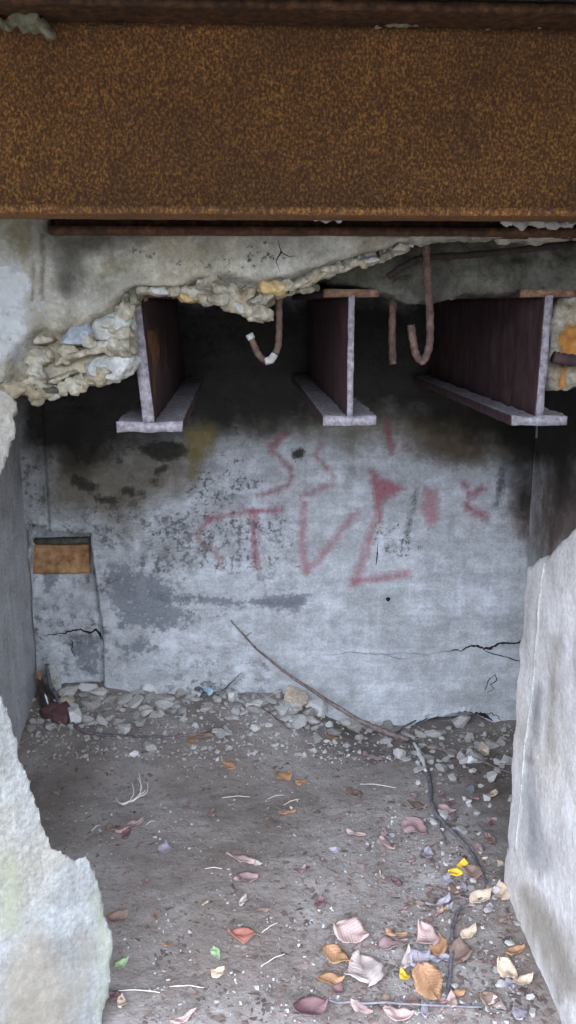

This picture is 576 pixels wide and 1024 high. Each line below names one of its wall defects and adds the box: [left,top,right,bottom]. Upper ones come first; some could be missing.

spalling [0,241,576,407]
rust [559,325,576,388]
water stain [61,426,213,504]
water stain [187,459,259,509]
crack [47,628,103,657]
crack [334,640,521,726]